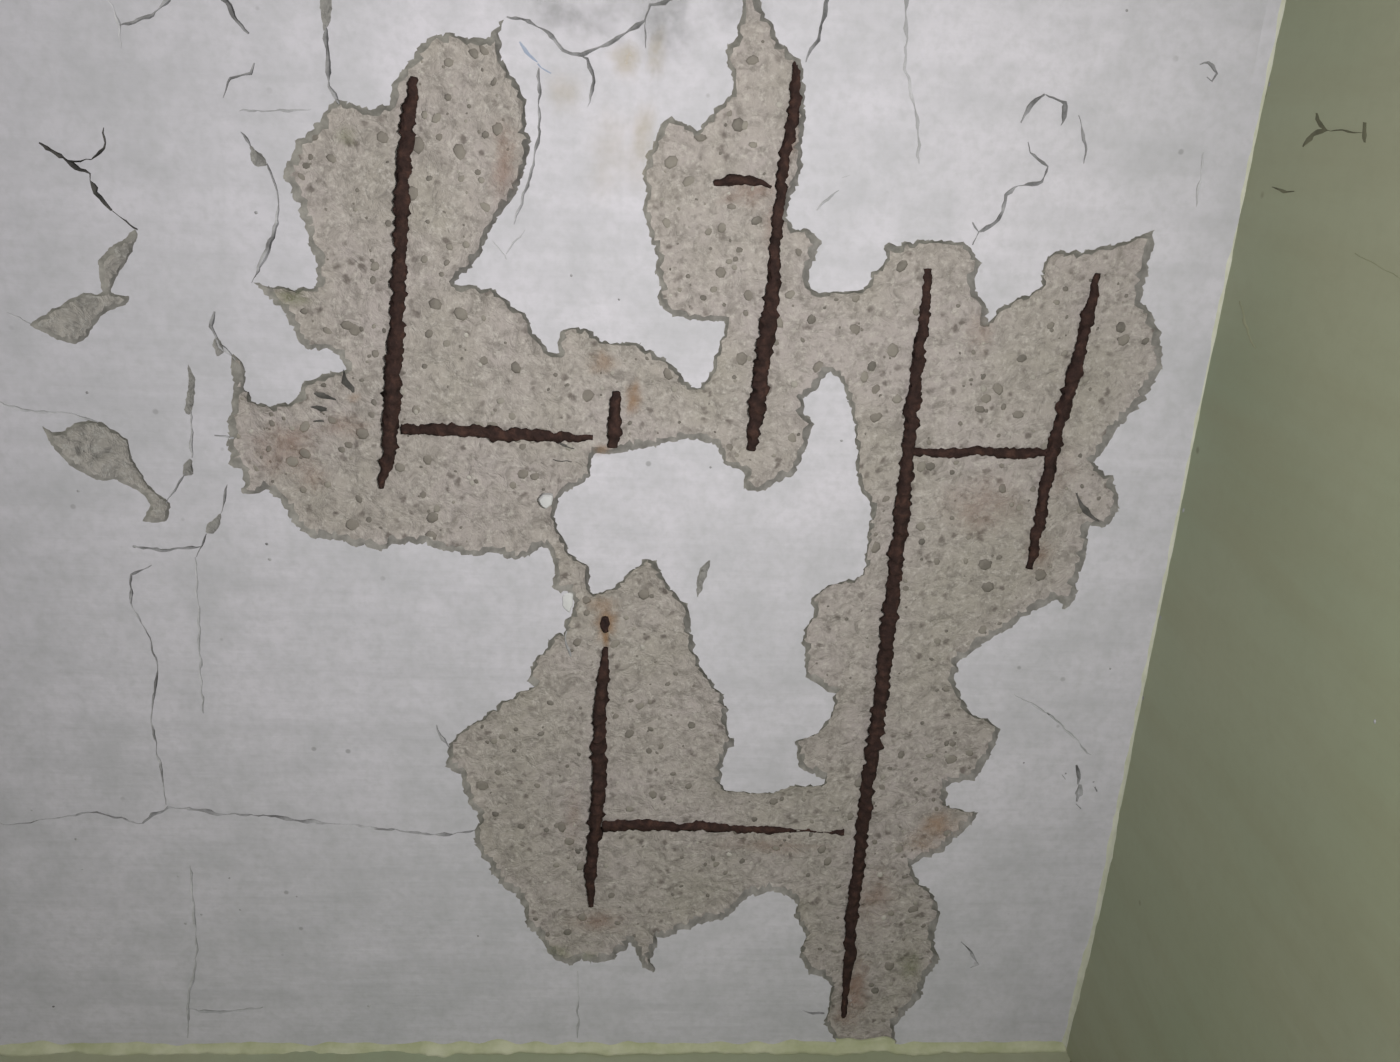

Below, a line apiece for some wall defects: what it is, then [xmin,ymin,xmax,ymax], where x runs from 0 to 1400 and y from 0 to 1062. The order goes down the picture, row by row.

crack [39,127,138,230]
crack [108,0,171,48]
crack [221,0,340,283]
crack [492,0,672,260]
crack [805,0,829,62]
crack [903,0,921,164]
crack [972,94,1087,245]
peeling [30,229,138,344]
peeling [43,420,171,523]
crack [311,370,355,422]
spalling [212,0,1163,1043]
crack [0,485,474,836]